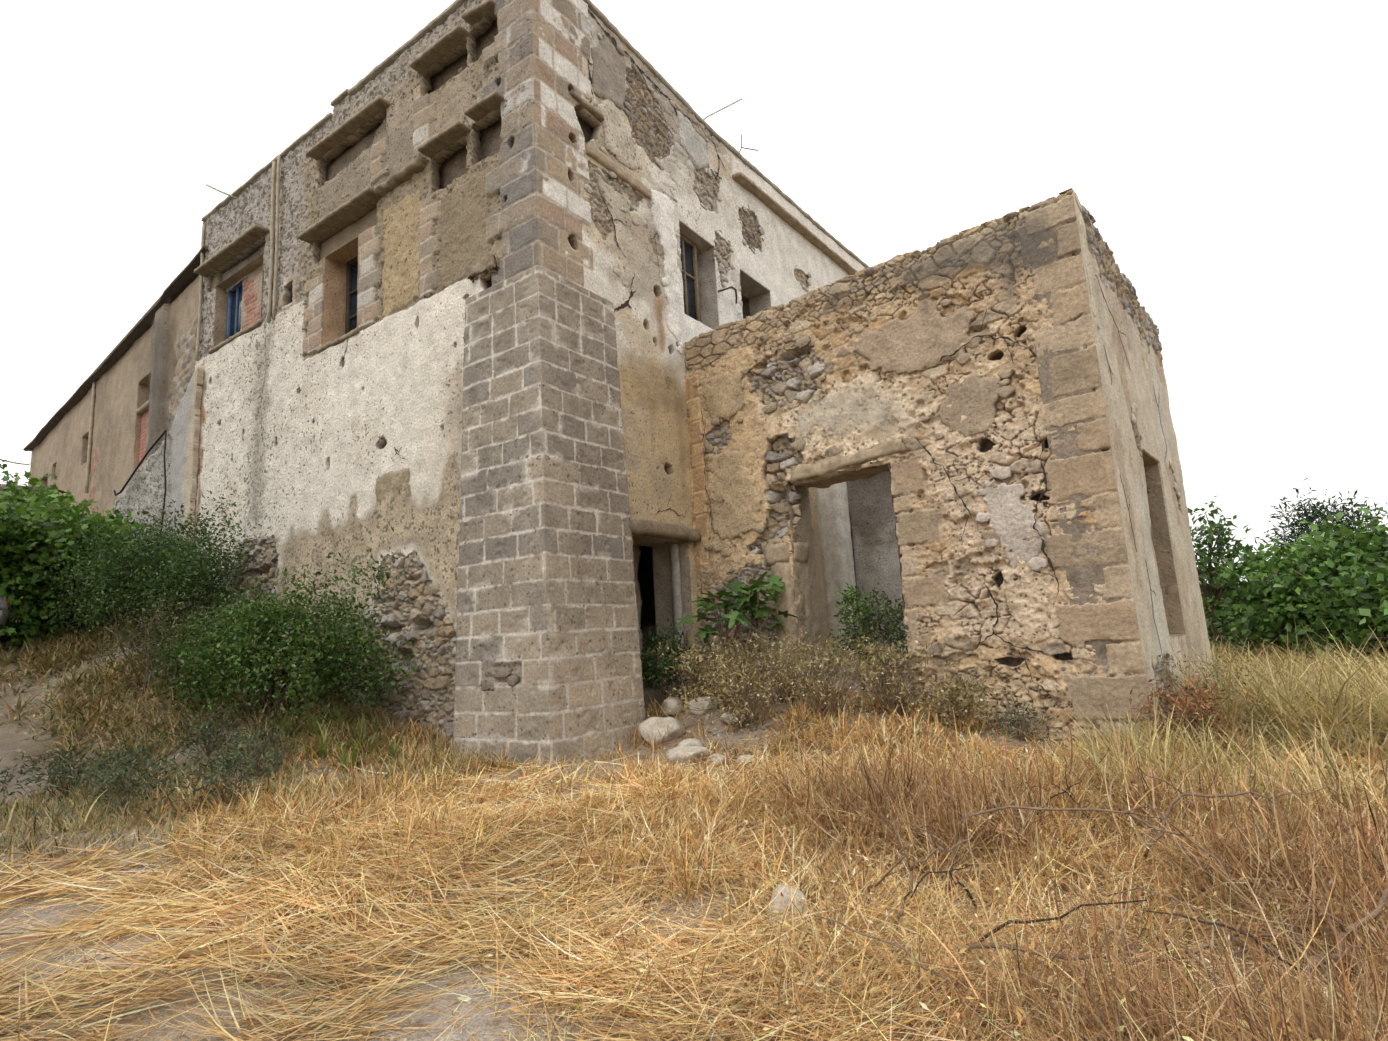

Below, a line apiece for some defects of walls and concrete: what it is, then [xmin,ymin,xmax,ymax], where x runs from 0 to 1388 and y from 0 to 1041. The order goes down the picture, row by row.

spalling [573,6,722,355]
spalling [712,205,765,287]
flaking render [853,299,1015,453]
damp [278,455,461,650]
spalling [359,550,457,737]
flaking render [975,466,1048,587]